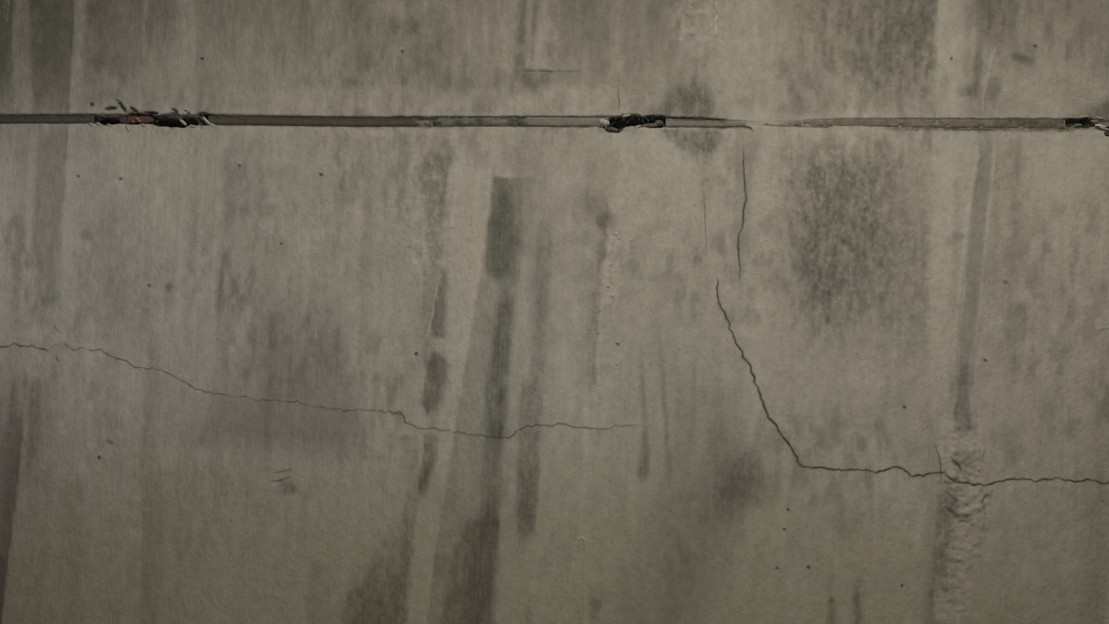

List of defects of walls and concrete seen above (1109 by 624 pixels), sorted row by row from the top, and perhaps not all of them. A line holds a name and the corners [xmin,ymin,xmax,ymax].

spalling [89,100,216,131]
spalling [599,114,666,133]
crack [664,116,828,129]
spalling [1065,116,1109,137]
crack [738,159,747,265]
crack [716,281,1109,486]